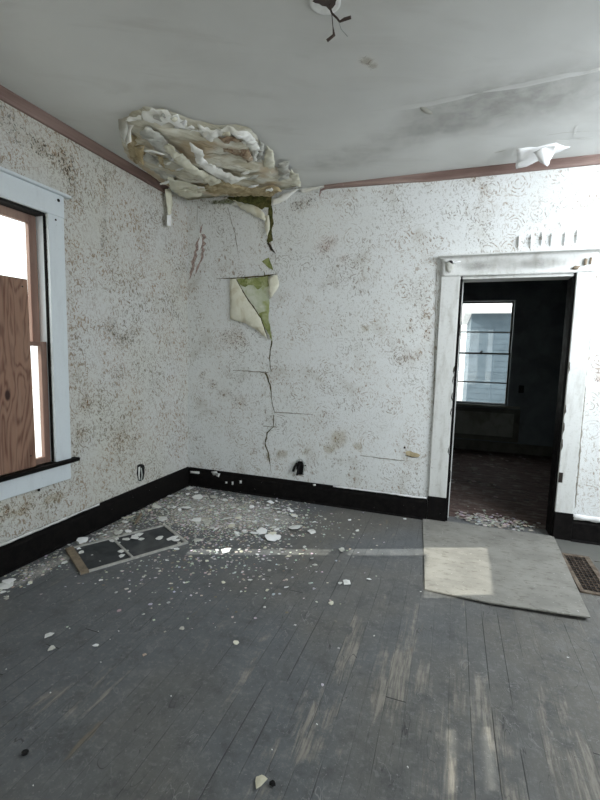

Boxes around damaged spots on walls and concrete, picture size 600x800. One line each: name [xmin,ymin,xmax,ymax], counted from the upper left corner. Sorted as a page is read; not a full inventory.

crack [370,67,600,115]
peeling [118,106,323,270]
crack [233,340,312,466]